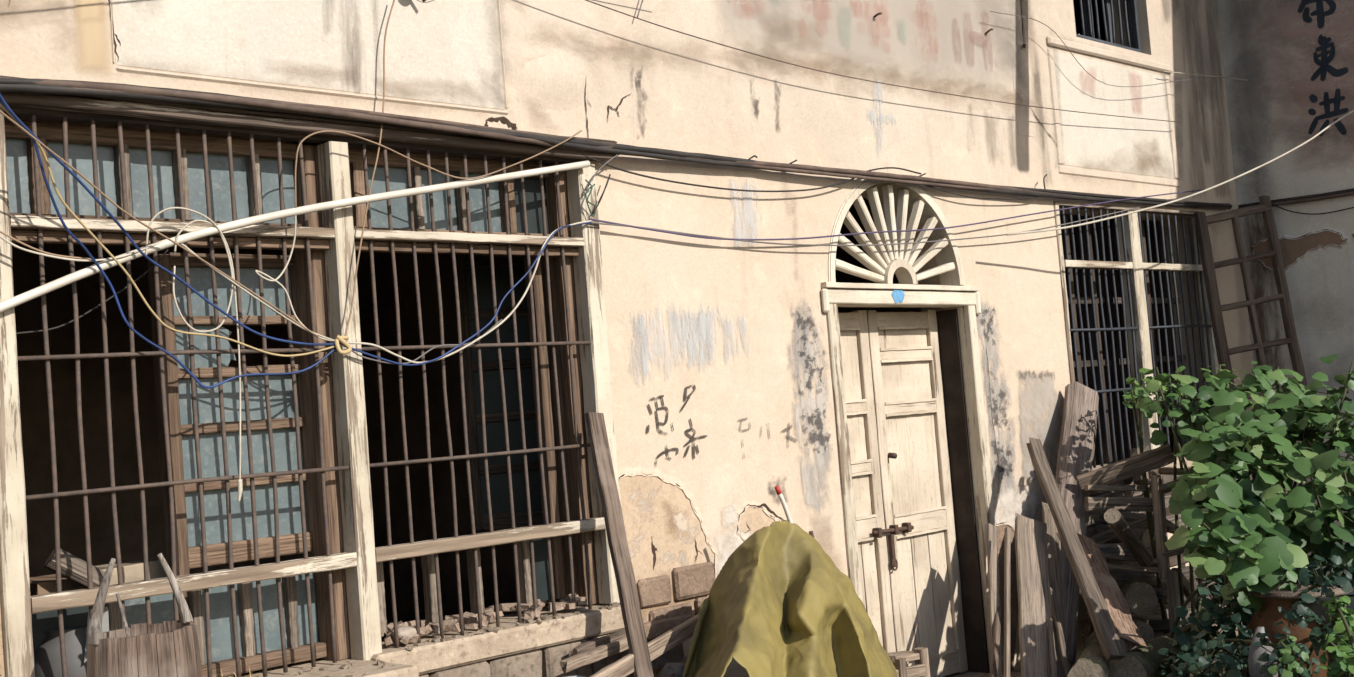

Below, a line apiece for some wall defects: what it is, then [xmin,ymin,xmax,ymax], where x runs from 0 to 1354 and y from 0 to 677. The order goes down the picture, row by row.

peeling [1251,227,1354,276]
mould [790,308,831,509]
mould [977,305,1017,495]
peeling [618,466,781,623]